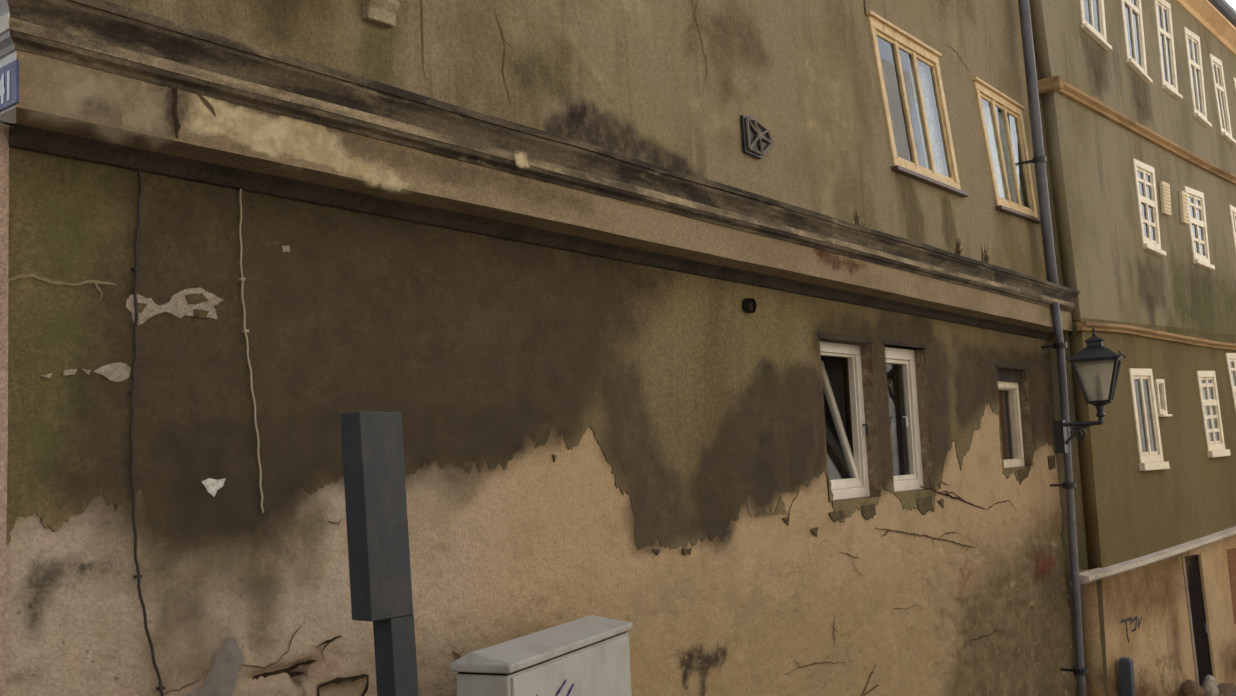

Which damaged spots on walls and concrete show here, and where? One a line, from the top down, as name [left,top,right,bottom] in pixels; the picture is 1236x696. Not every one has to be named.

peeling [29,55,413,191]
flaking render [126,287,223,325]
flaking render [40,362,131,382]
leakage [72,180,656,533]
leakage [609,363,825,547]
crack [920,482,1019,512]
flaking render [405,402,1077,696]
crack [875,528,978,549]
leakage [30,564,62,623]
flaking render [4,475,377,696]
crack [242,621,342,669]
crack [156,677,204,695]